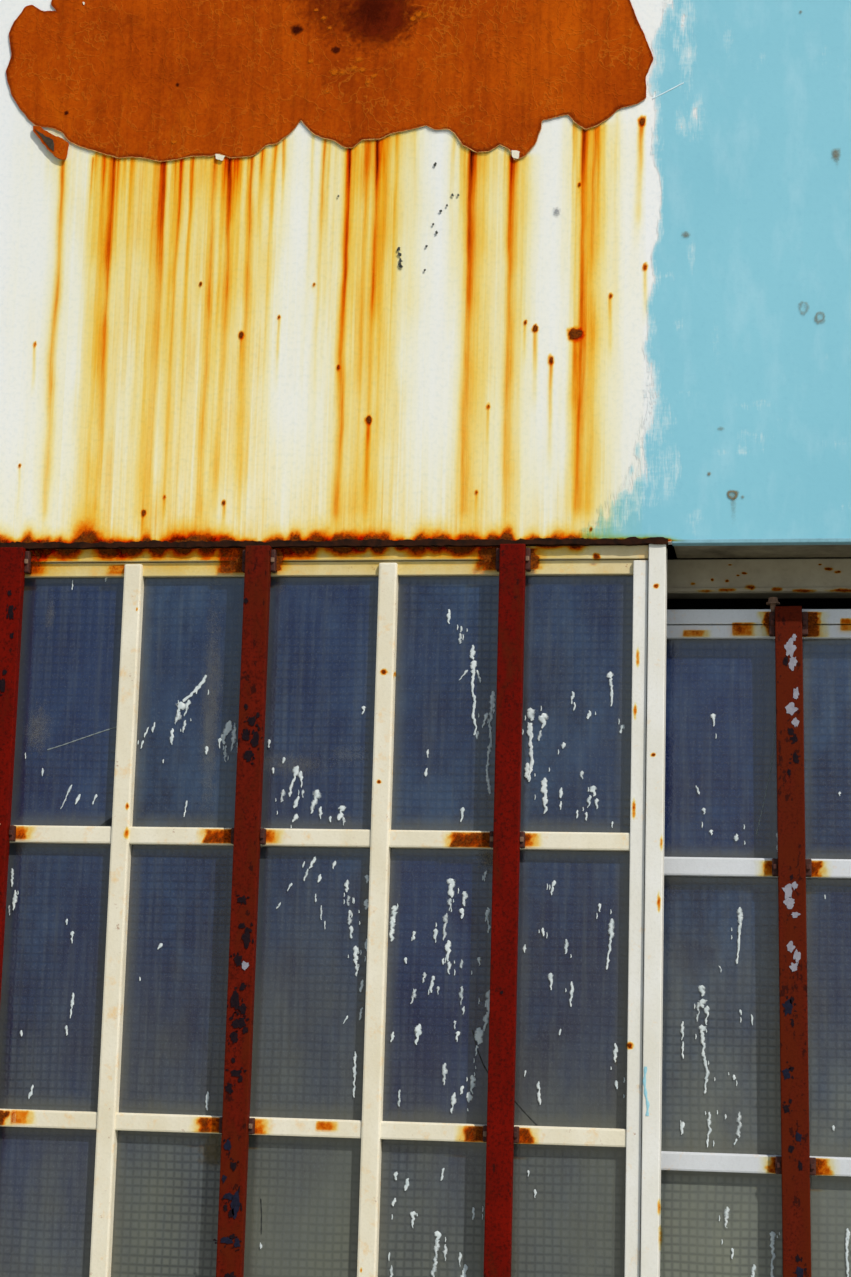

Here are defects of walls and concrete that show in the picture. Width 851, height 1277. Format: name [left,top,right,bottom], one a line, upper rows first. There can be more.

corrosion [6,0,653,314]
corrosion [568,232,584,444]
corrosion [802,612,819,637]
corrosion [450,832,490,847]
corrosion [811,861,822,877]
corrosion [0,1110,28,1125]